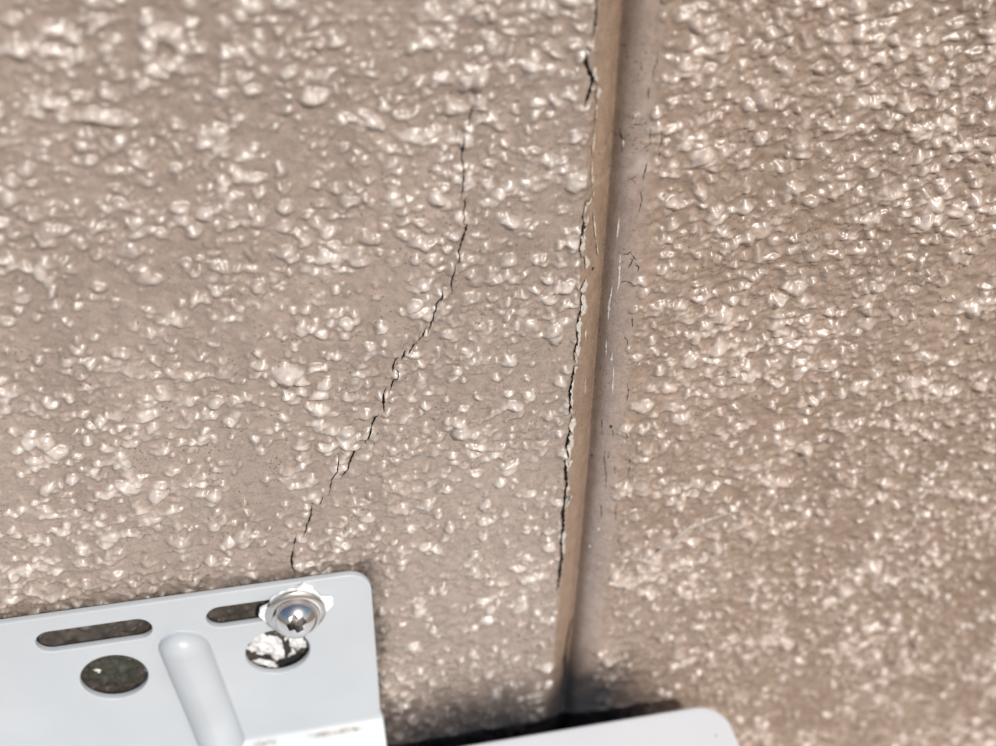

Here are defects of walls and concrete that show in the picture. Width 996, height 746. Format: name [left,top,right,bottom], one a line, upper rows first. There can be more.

crack [584,0,602,108]
crack [621,251,639,286]
crack [290,107,473,573]
crack [556,198,592,593]
crack [601,419,630,481]